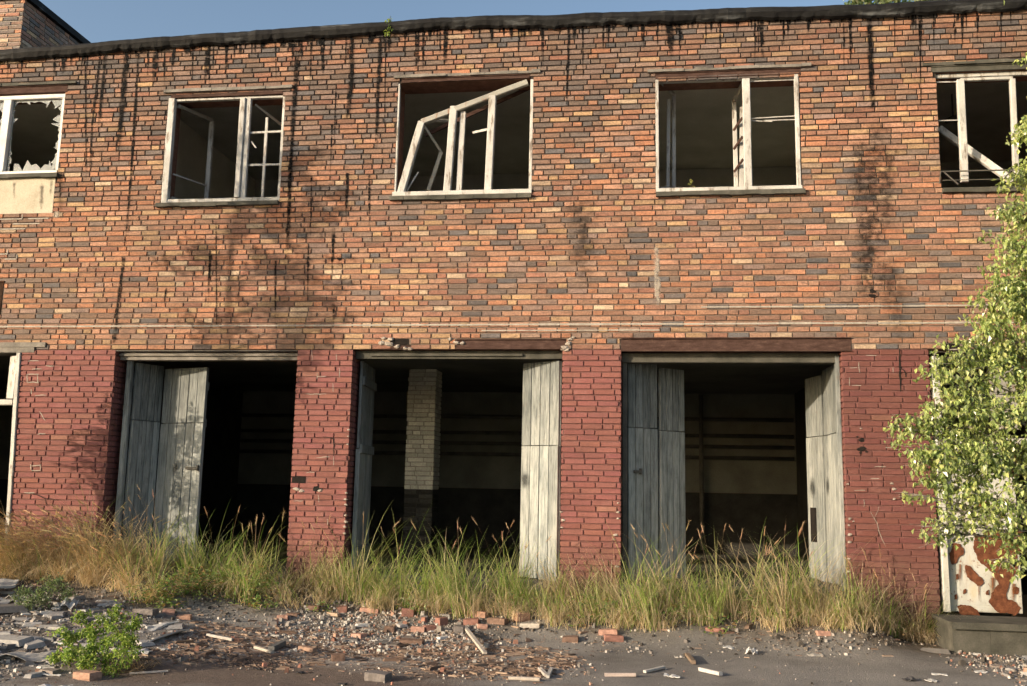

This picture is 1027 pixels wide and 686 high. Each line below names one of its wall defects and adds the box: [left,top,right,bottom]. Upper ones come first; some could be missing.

damp [41,54,107,171]
damp [116,38,332,246]
damp [330,37,354,172]
damp [368,33,391,143]
damp [404,29,448,65]
damp [559,26,584,104]
damp [629,22,721,52]
damp [750,19,813,54]
damp [867,18,879,107]
damp [894,14,934,102]
damp [113,258,125,342]
rust [949,531,1021,616]